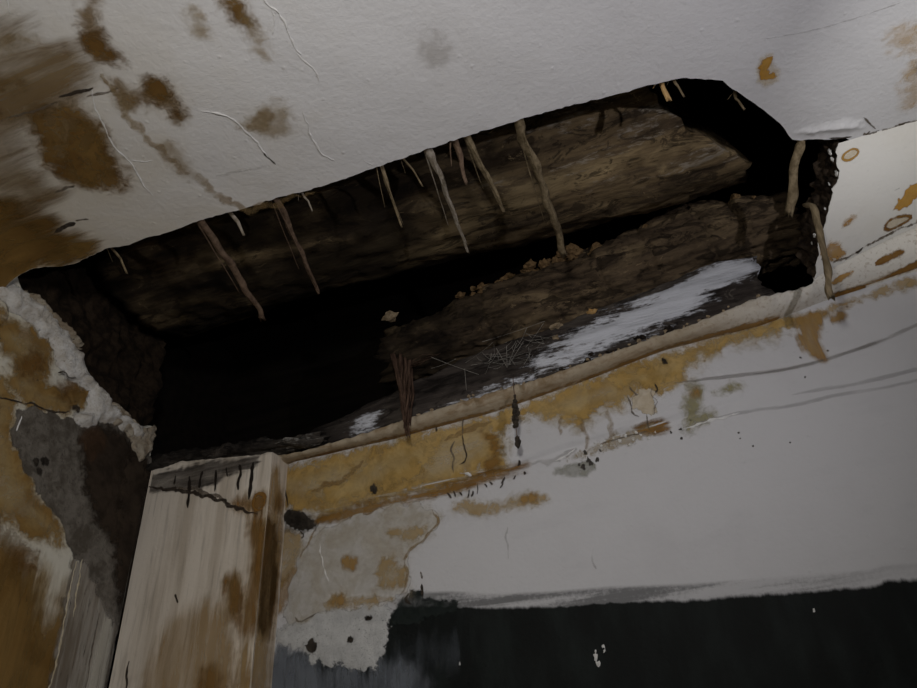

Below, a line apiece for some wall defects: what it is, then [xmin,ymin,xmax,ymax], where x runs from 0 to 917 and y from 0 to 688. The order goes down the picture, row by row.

leakage [0,0,127,191]
crack [10,88,153,196]
crack [203,111,276,165]
spalling [796,139,839,278]
crack [0,397,69,413]
leakage [0,307,89,548]
spalling [0,282,157,688]
leakage [149,456,260,508]
leakage [251,260,917,688]
peeling [628,384,658,430]
crack [685,413,739,429]
peeling [272,491,440,688]